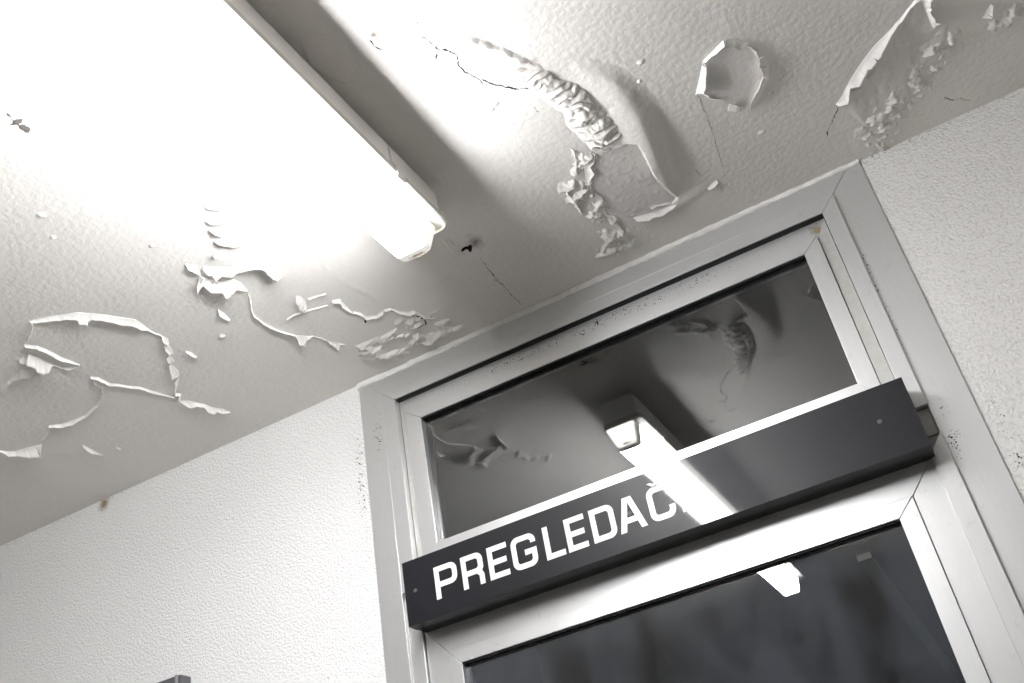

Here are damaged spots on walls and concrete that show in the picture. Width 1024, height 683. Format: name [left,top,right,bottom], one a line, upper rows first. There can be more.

peeling [982,0,1024,33]
crack [422,37,538,112]
peeling [695,38,771,113]
peeling [836,0,964,156]
spalling [557,144,677,259]
peeling [185,264,466,363]
peeling [0,312,231,459]